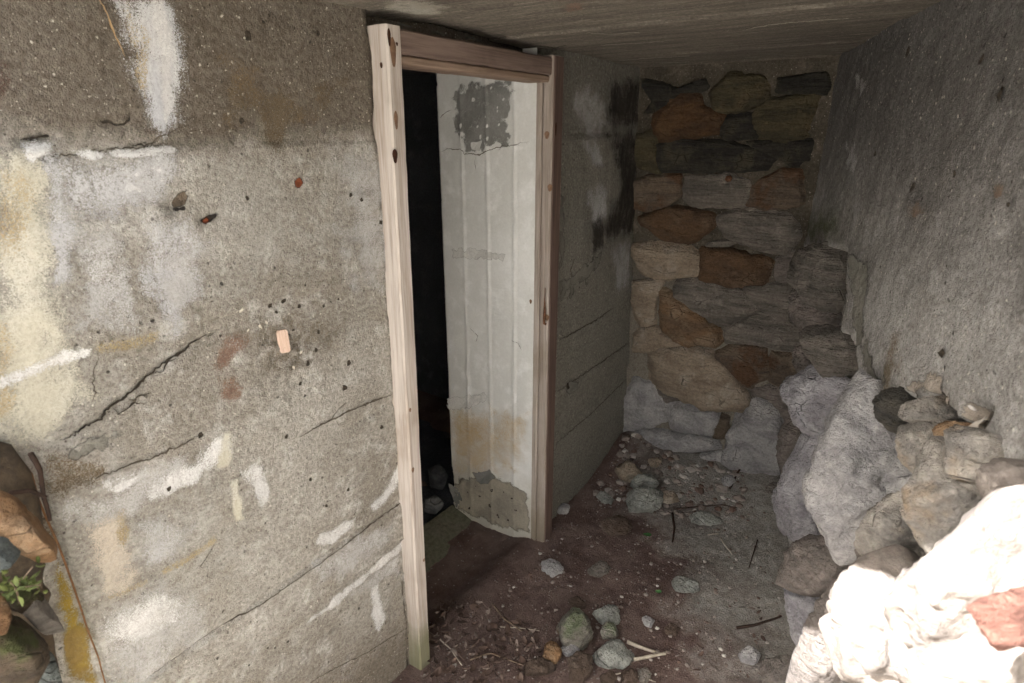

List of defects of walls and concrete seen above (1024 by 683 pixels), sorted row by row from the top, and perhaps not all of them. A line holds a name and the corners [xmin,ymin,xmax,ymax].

peeling [453,80,518,154]
leakage [571,74,640,295]
crack [63,333,213,440]
crack [91,436,198,479]
spalling [449,470,530,532]